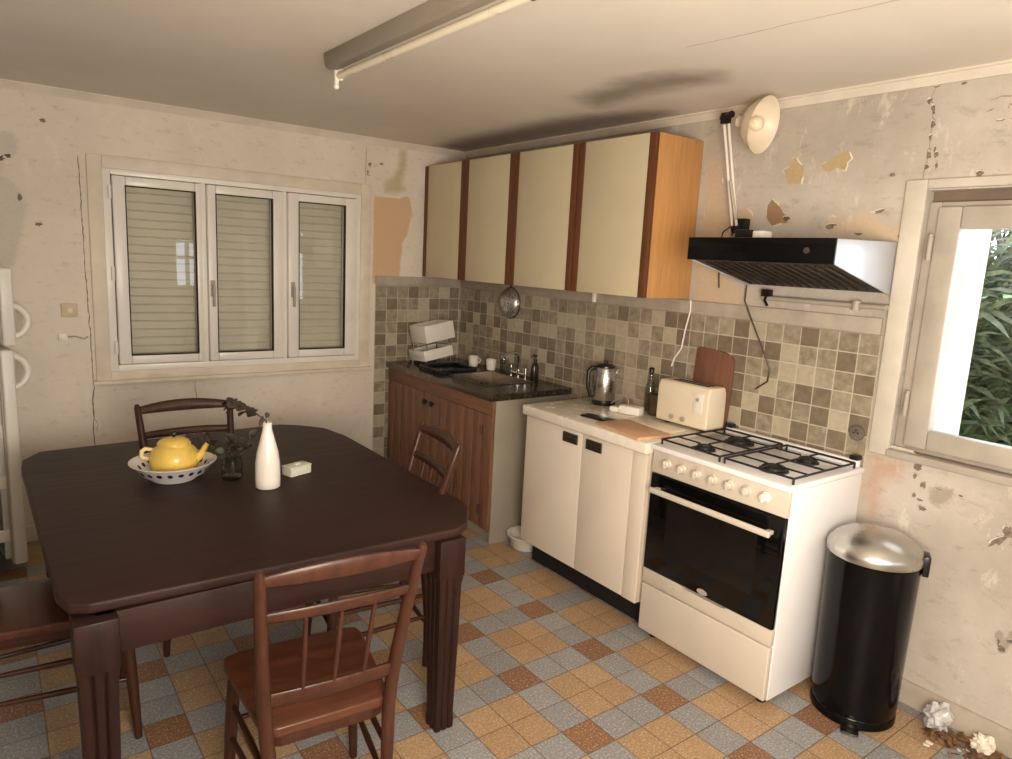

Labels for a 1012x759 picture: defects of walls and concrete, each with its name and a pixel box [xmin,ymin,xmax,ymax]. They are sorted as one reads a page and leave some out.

peeling [0,125,43,272]
peeling [696,150,792,237]
peeling [781,154,806,187]
peeling [819,149,854,175]
peeling [370,193,415,286]
flaking render [911,463,963,512]
flaking render [988,524,1012,546]
flaking render [991,626,1012,657]